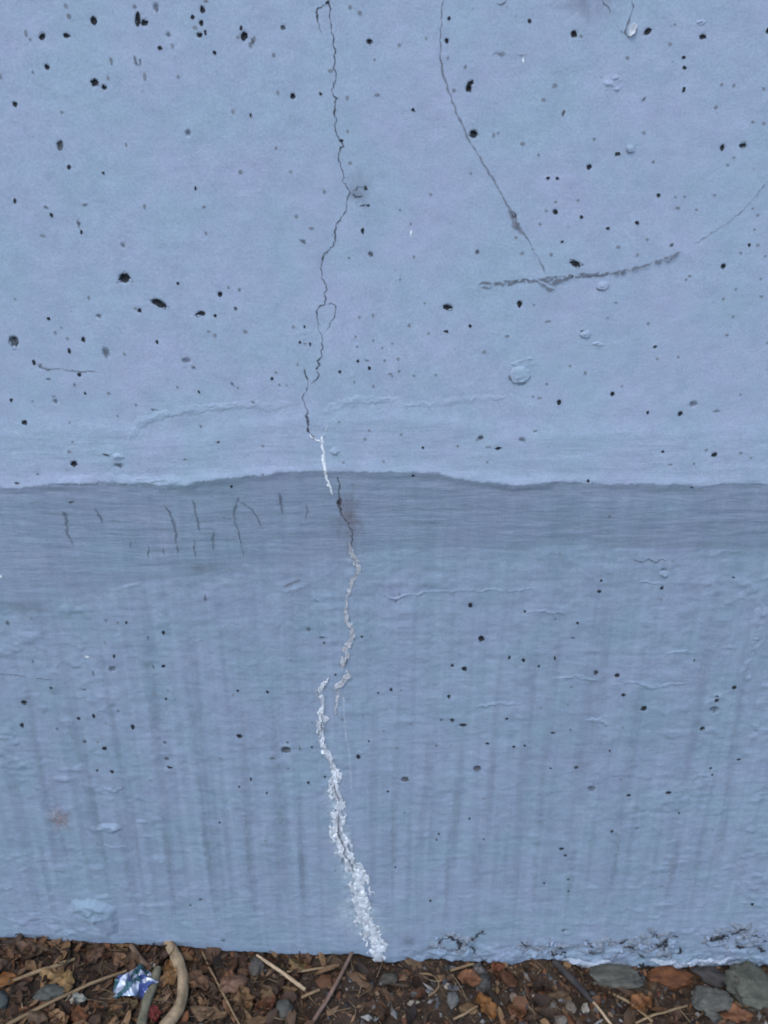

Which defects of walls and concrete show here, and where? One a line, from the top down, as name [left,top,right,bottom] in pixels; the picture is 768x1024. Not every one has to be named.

crack [302,4,389,962]